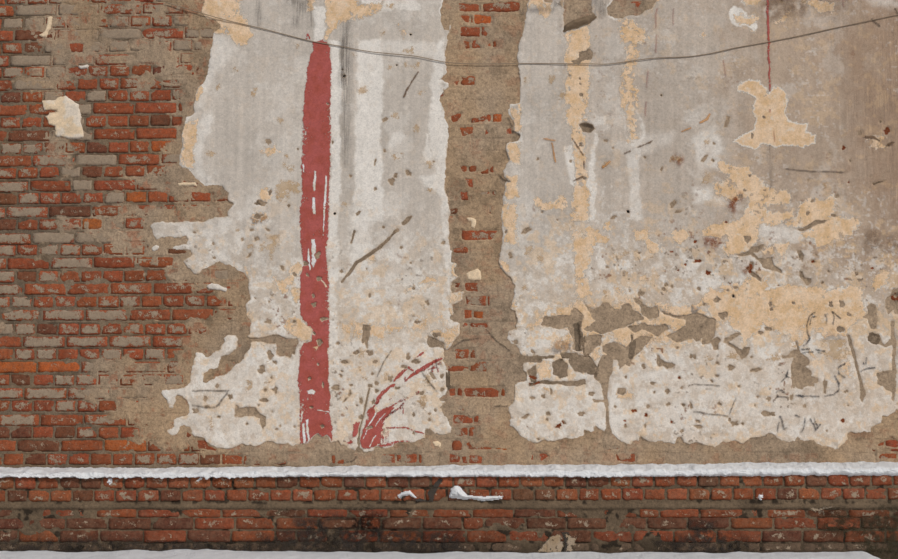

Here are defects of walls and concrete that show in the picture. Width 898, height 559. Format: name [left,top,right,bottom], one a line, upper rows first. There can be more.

flaking render [86,0,898,469]